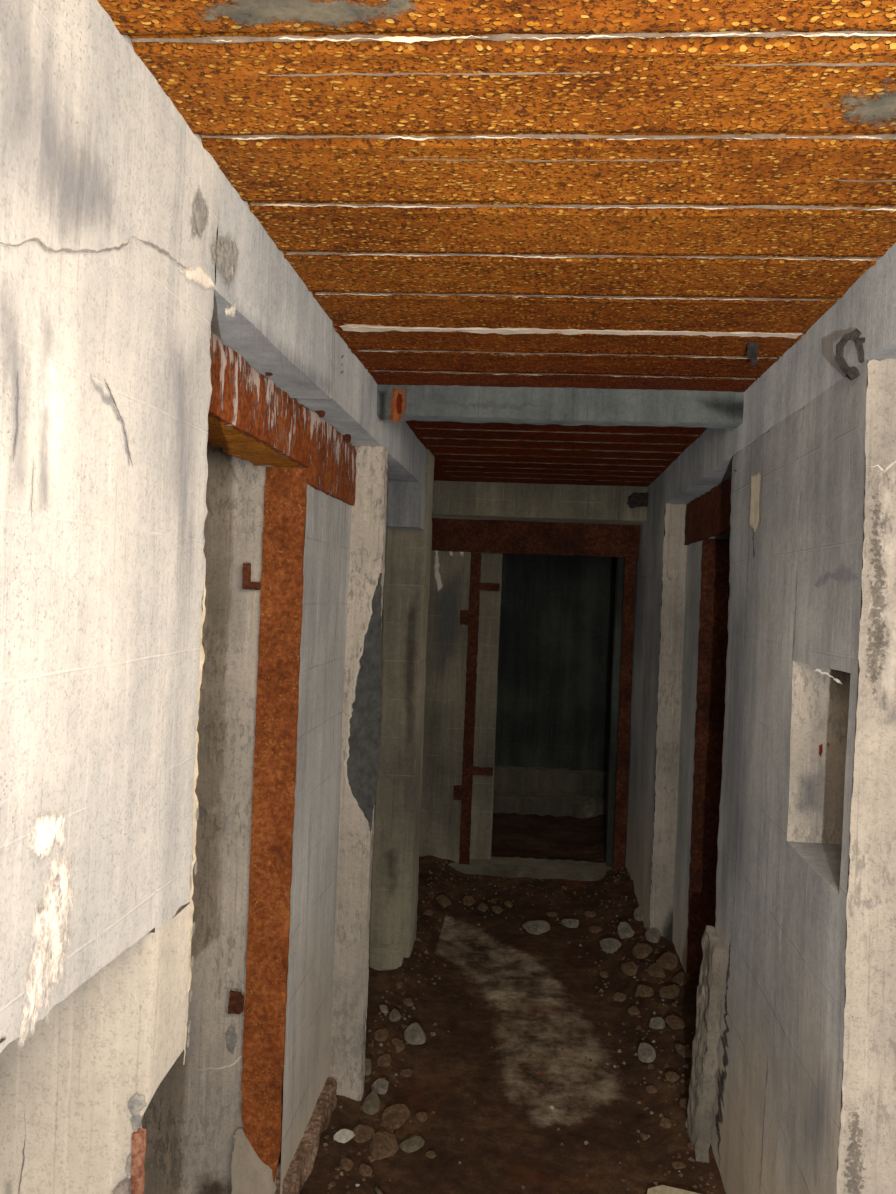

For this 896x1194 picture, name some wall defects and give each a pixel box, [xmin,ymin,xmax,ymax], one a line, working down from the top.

crack [0,237,213,281]
corrosion [390,390,406,422]
spalling [343,573,382,831]
peeling [20,813,74,1042]
spalling [128,1093,146,1131]
spalling [113,1154,131,1194]